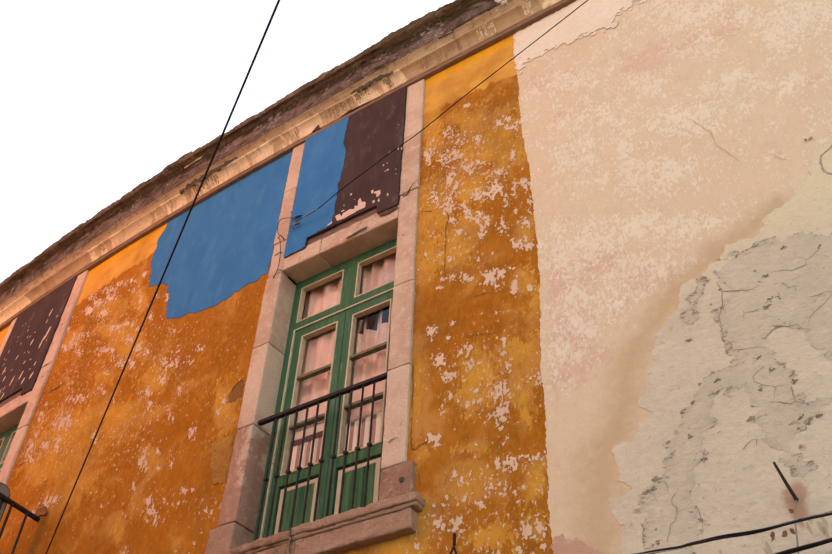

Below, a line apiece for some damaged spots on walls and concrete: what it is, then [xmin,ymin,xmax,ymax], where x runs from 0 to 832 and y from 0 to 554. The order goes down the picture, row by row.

peeling [512,0,647,75]
crack [819,145,832,175]
peeling [327,190,389,226]
peeling [421,126,539,298]
peeling [82,270,150,404]
peeling [137,344,205,411]
peeling [430,344,512,446]
flaking render [609,144,832,554]
crack [714,282,831,404]
peeling [428,495,467,534]
peeling [450,451,546,508]
corrosion [770,476,818,541]